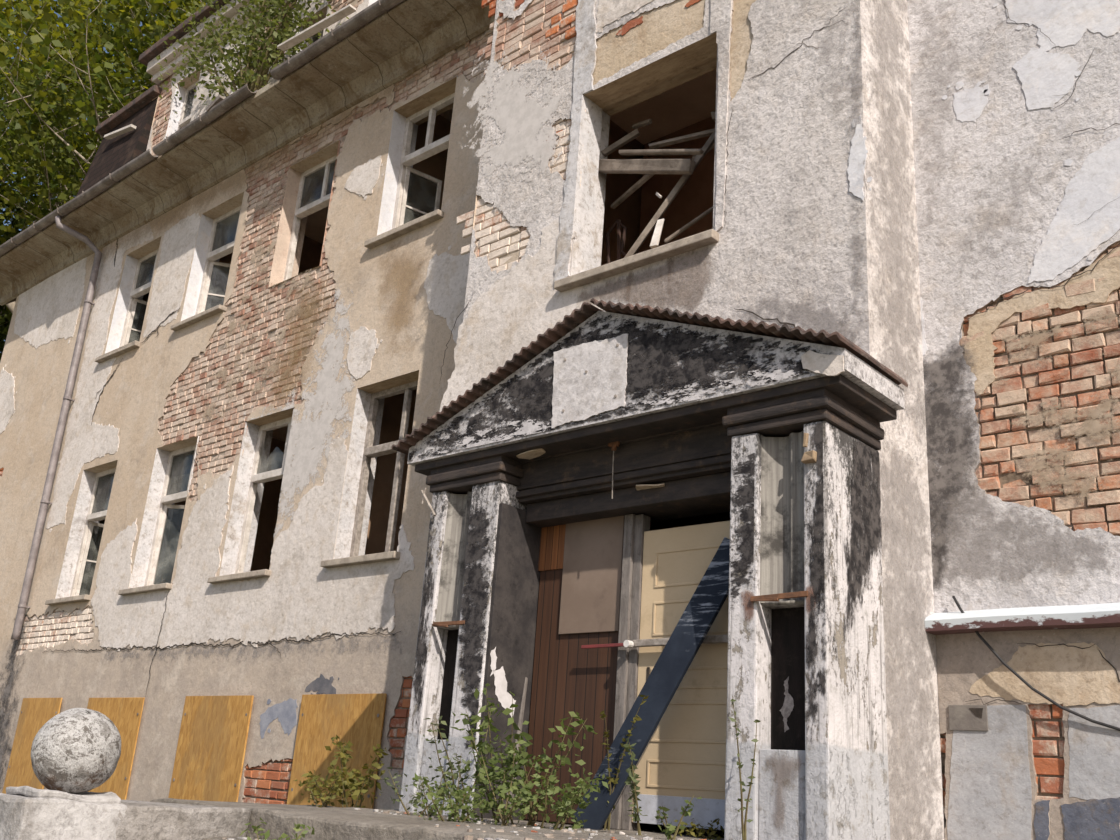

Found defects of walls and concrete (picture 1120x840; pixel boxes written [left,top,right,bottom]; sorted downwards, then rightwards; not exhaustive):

crack [750,6,848,79]
crack [1050,48,1095,109]
flaking render [14,0,603,657]
flaking render [959,137,1120,536]
water stain [417,419,555,459]
water stain [621,361,800,416]
water stain [853,0,1107,840]
crack [42,591,401,691]
water stain [806,540,826,742]
flaking render [242,758,293,804]
flaking render [387,676,413,777]
spalling [969,642,1120,840]